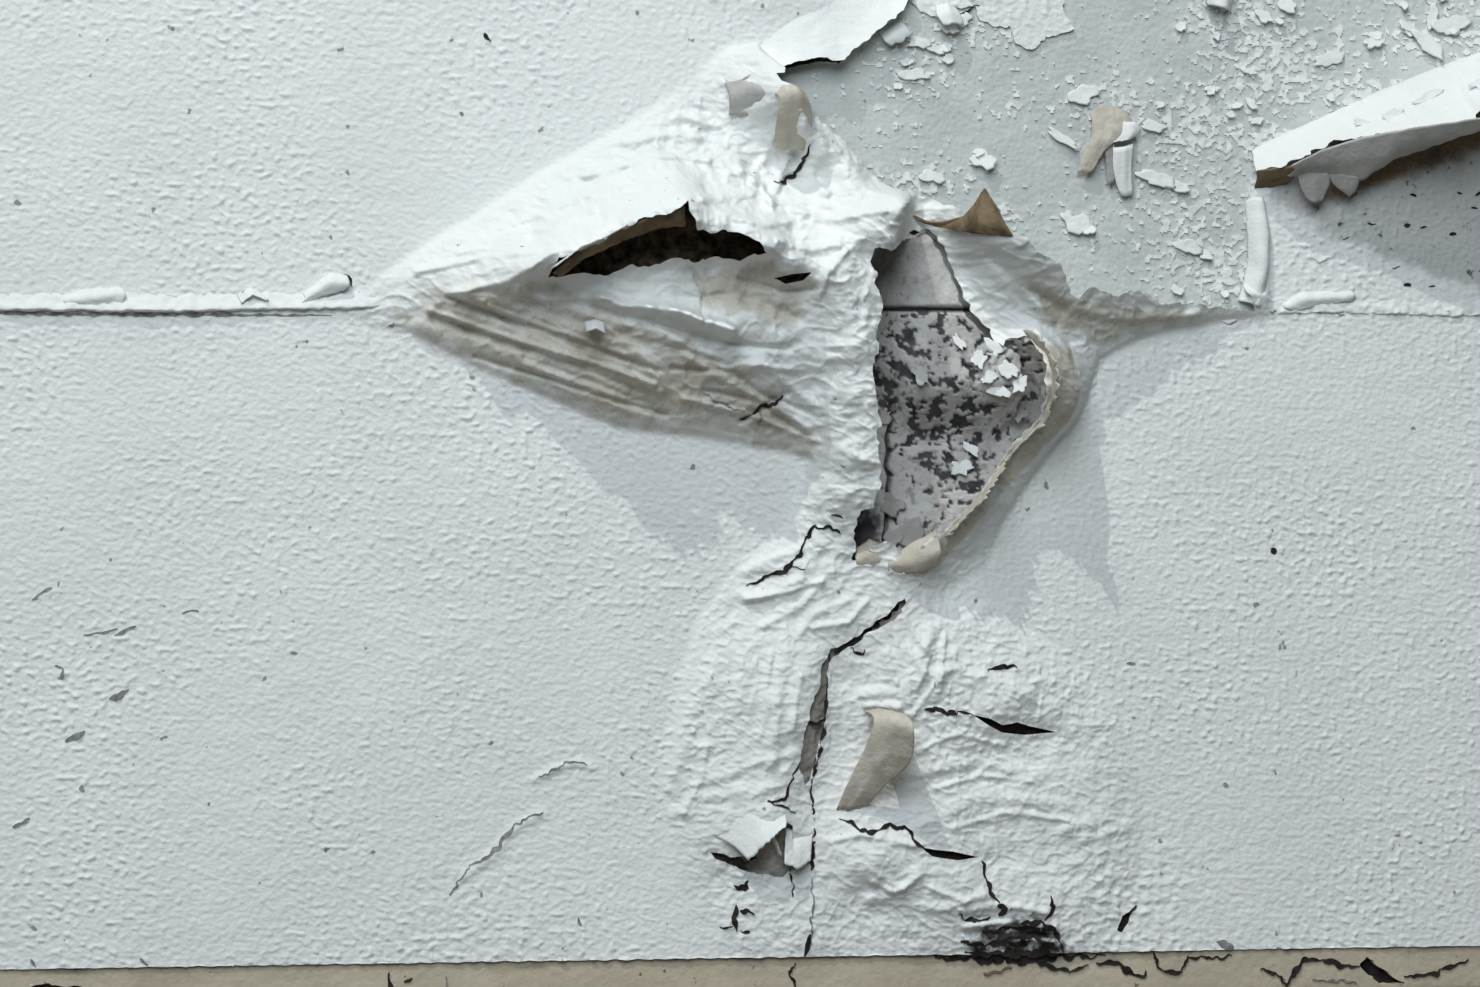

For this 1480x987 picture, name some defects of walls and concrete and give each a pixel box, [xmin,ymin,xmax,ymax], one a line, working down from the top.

peeling [776,0,1480,324]
damp [433,297,551,376]
damp [569,318,766,416]
spalling [851,228,1047,561]
crack [746,514,843,586]
crack [987,663,1017,671]
crack [925,706,1054,735]
crack [768,599,1000,987]
crack [711,853,756,865]
damp [959,896,1073,959]